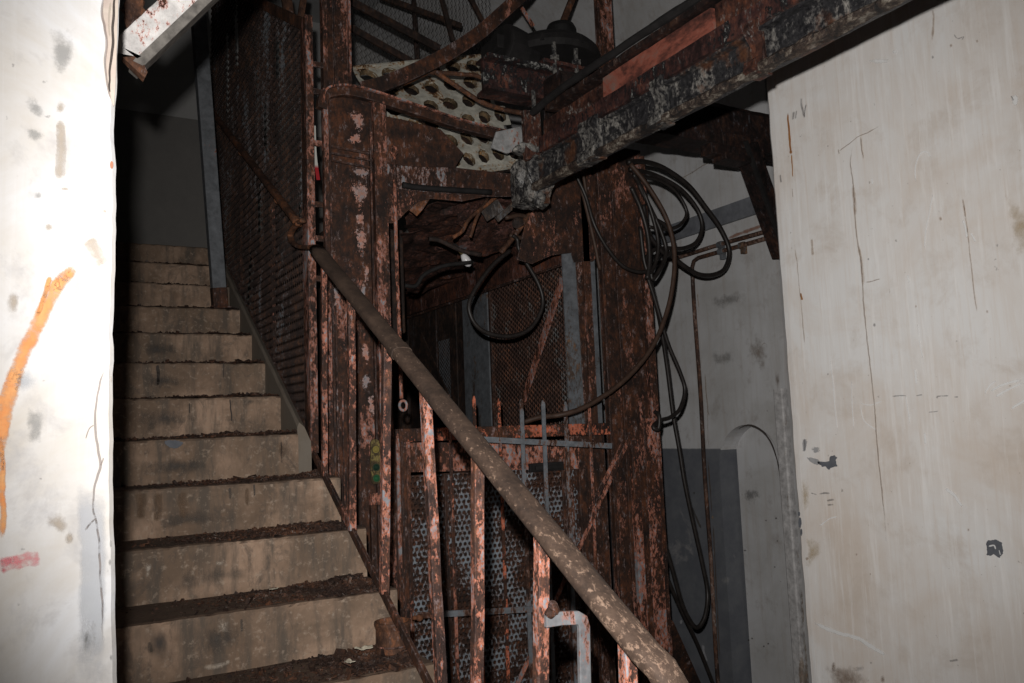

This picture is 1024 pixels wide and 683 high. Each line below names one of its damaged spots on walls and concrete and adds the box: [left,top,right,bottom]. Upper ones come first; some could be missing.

peeling [802,440,837,470]
peeling [986,540,1003,558]